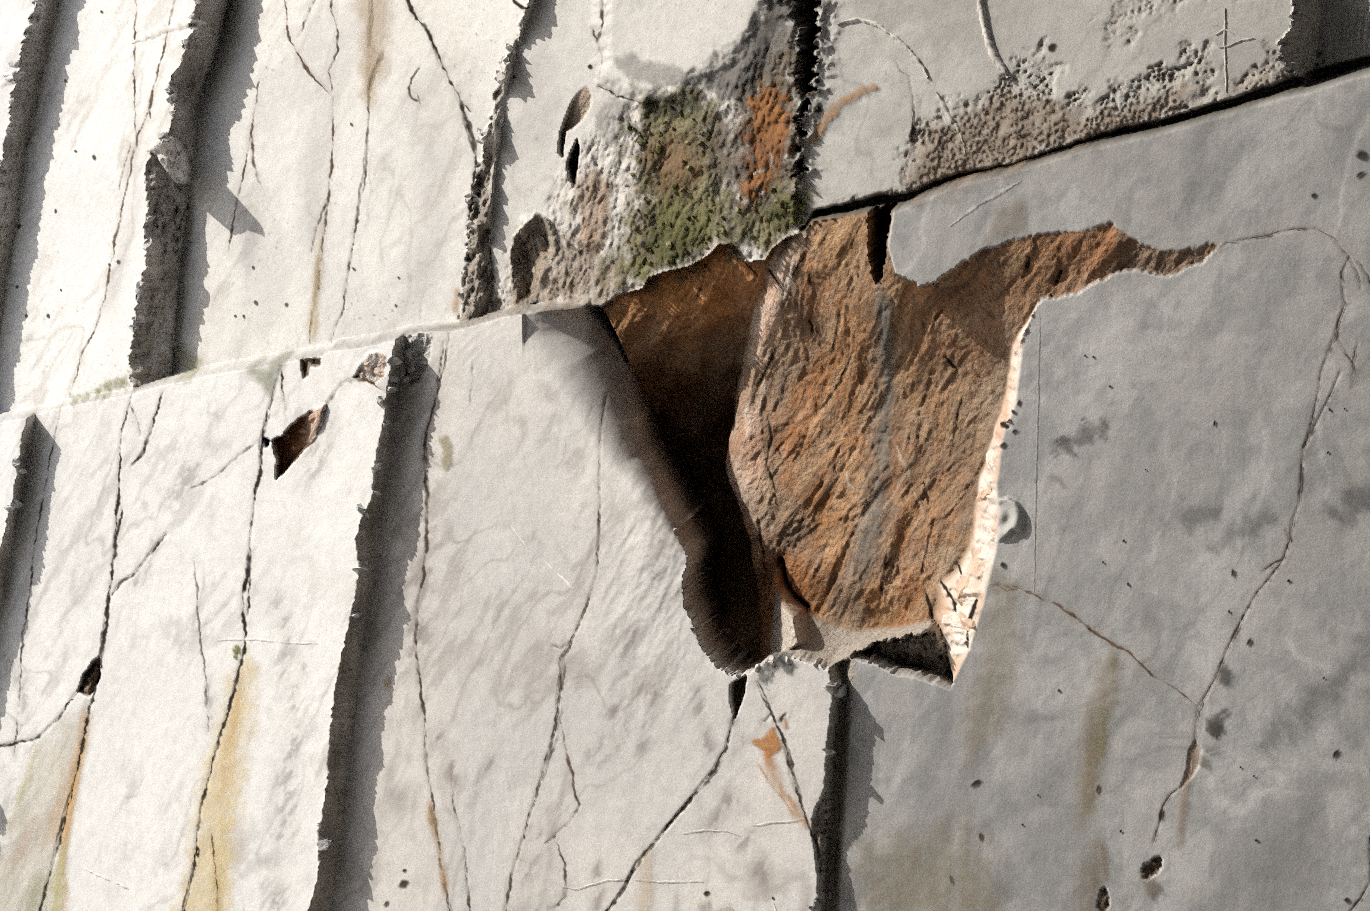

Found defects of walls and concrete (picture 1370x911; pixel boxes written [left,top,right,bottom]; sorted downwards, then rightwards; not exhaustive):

crack [406,0,477,231]
leakage [595,95,634,144]
leakage [614,0,813,245]
rust [741,86,797,205]
crack [0,2,172,911]
leakage [186,689,243,911]
crack [182,371,380,911]
spalling [275,405,326,479]
spalling [308,333,432,911]
crack [605,683,816,911]
rust [753,723,787,777]
spalling [604,202,1221,911]